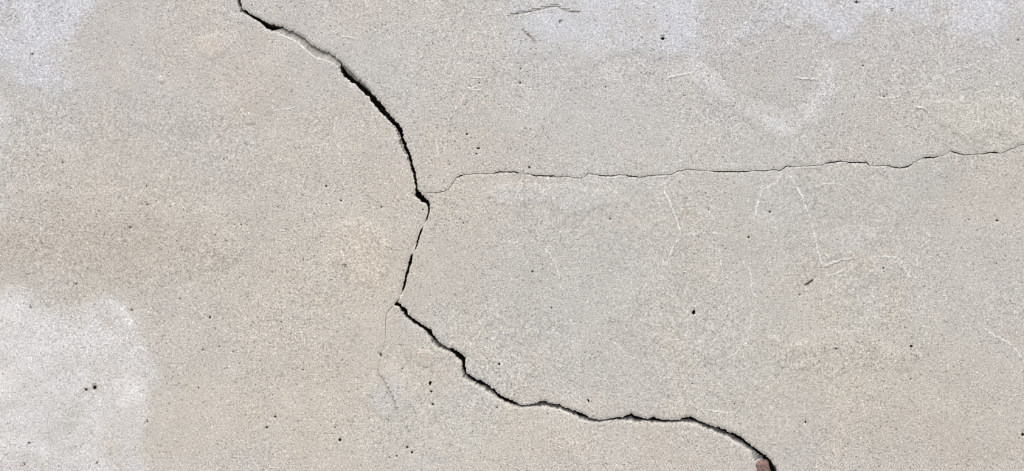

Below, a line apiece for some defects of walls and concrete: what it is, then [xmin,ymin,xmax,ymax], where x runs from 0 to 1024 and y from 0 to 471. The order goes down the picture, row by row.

crack [237,0,1024,471]